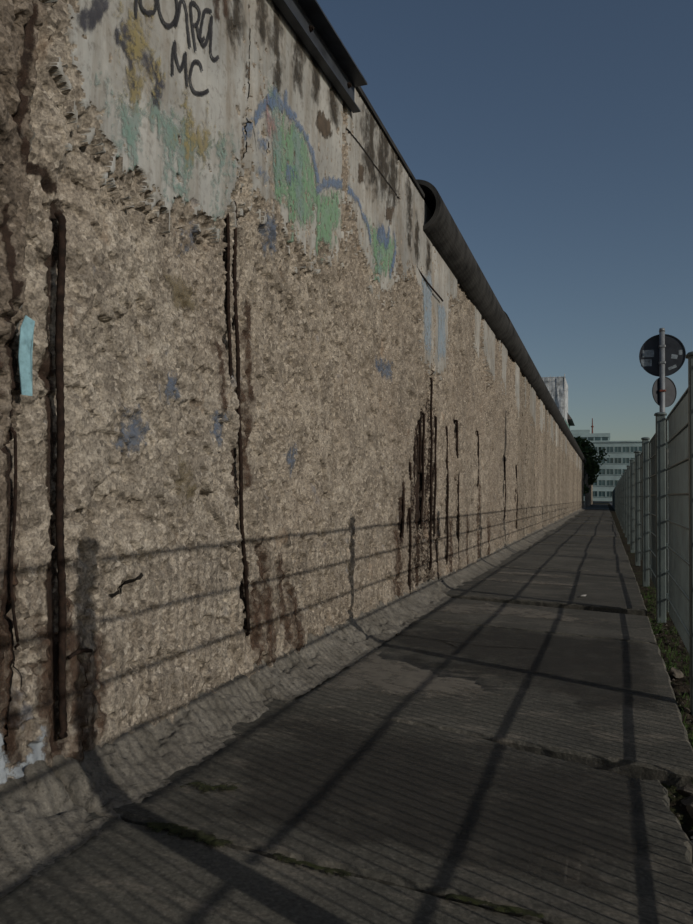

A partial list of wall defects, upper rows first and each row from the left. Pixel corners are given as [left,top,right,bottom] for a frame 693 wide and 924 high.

spalling [0,0,593,784]